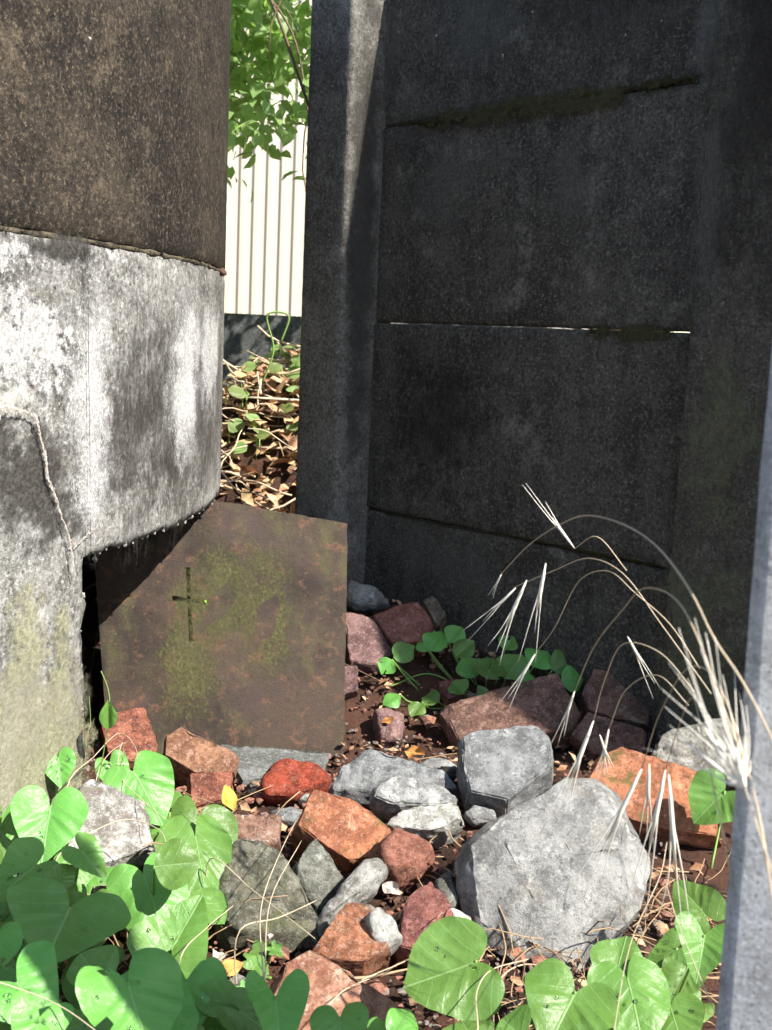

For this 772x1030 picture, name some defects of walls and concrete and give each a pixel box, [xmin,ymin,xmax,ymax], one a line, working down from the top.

crack [0,381,102,576]
leakage [0,233,223,558]